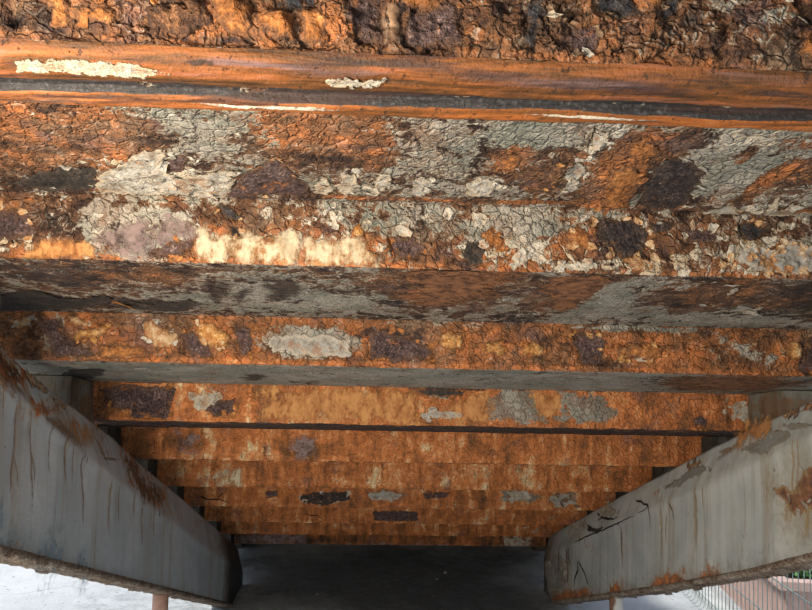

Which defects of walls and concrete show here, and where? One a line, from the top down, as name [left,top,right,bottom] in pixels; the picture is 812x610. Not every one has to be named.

corrosion [49,0,117,29]
corrosion [127,0,330,45]
corrosion [344,0,464,55]
peeling [15,58,171,79]
peeling [94,149,242,198]
peeling [313,173,394,197]
peeling [466,177,499,197]
peeling [718,198,812,279]
corrosion [30,312,260,362]
peeling [268,333,352,360]
corrosion [772,440,812,531]
crack [568,500,650,587]